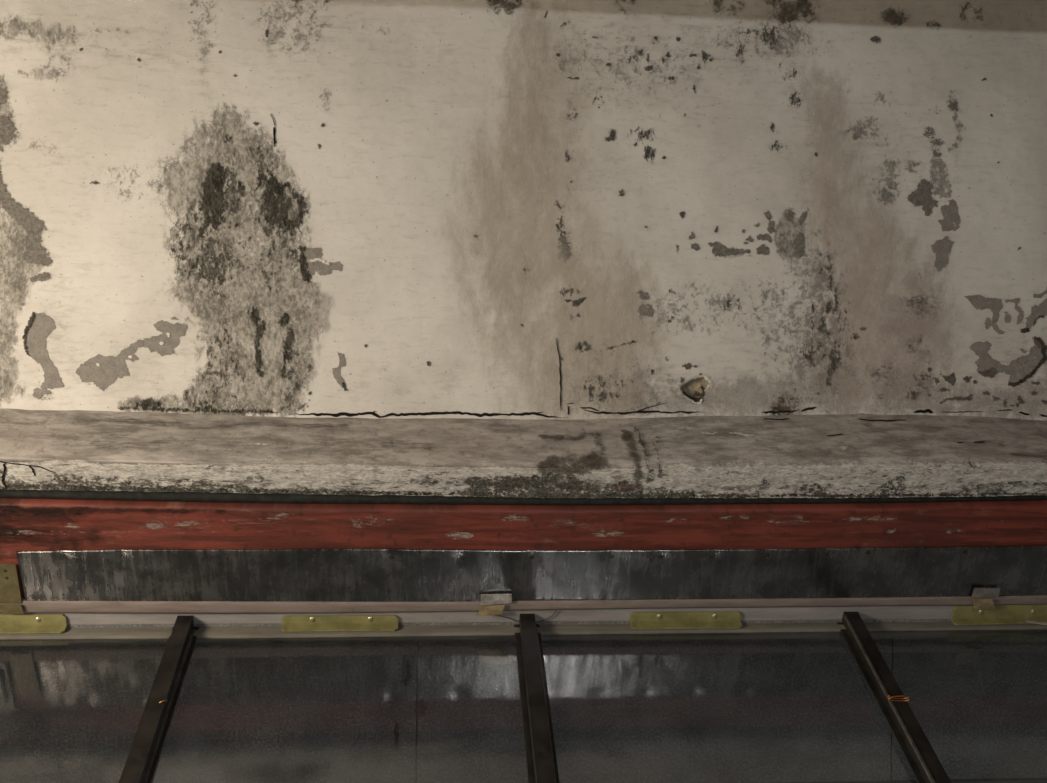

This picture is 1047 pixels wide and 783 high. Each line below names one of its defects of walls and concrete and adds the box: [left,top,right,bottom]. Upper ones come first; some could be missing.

damp [0,76,19,152]
damp [0,166,53,402]
damp [92,104,348,427]
peeling [676,209,807,260]
damp [487,91,1047,418]
peeling [931,199,961,272]
peeling [22,312,64,400]
peeling [76,317,188,391]
crack [298,338,698,418]
peeling [910,286,1047,407]
crack [0,461,56,489]
damp [0,427,1047,499]